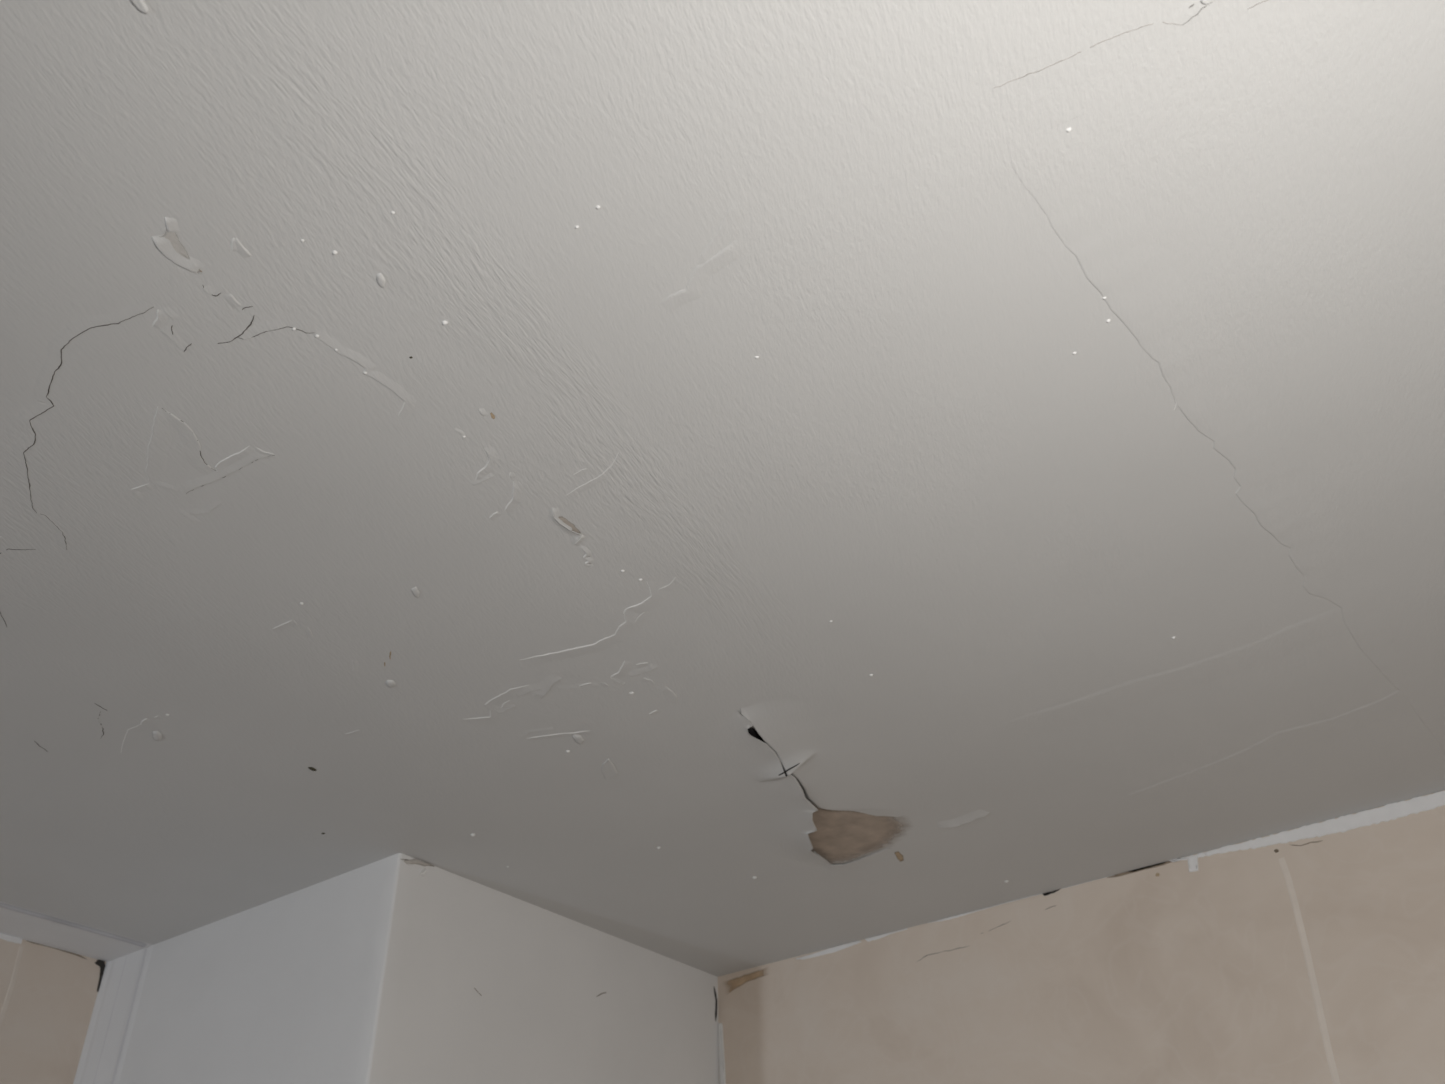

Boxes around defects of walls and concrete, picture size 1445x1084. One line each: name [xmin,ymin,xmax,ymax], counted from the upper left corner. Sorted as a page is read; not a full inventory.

crack [0,285,416,554]
peeling [717,699,937,876]